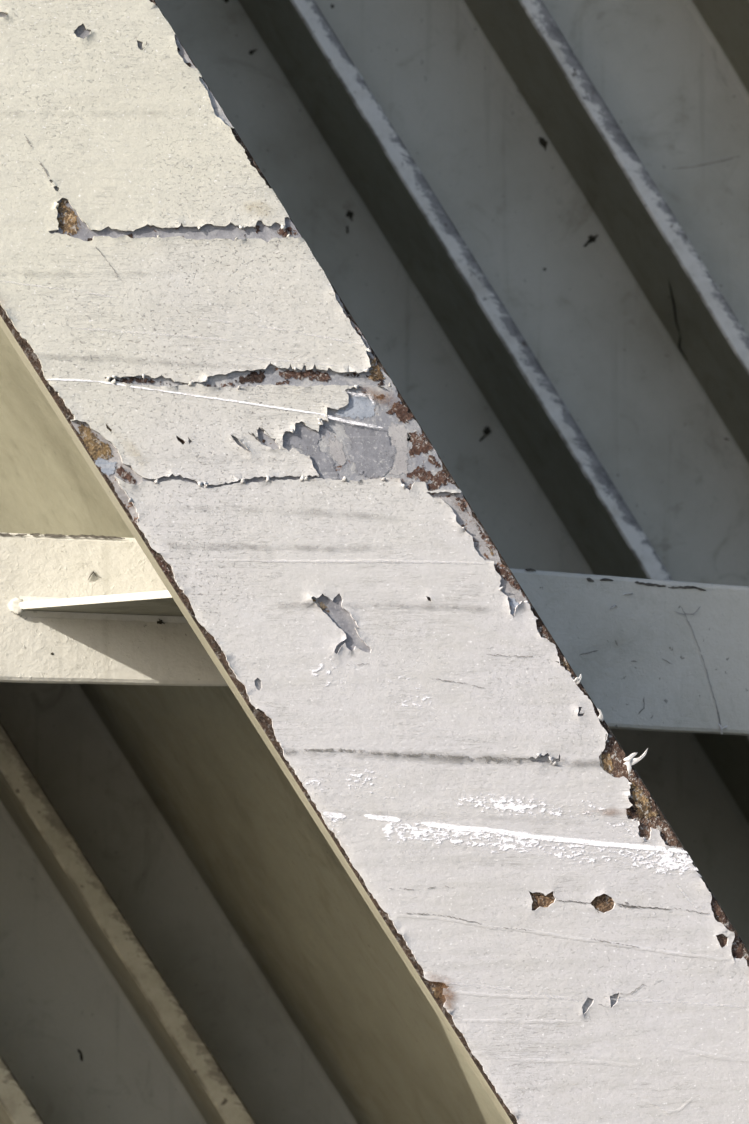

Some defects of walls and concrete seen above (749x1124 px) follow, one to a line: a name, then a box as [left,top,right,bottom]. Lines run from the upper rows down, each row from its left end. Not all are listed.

peeling [49,198,302,242]
peeling [105,348,458,491]
peeling [71,420,143,524]
peeling [311,594,371,654]
rust [599,734,684,864]
water stain [364,814,698,875]
rust [529,892,555,911]
rust [591,894,614,913]
rust [700,877,749,967]